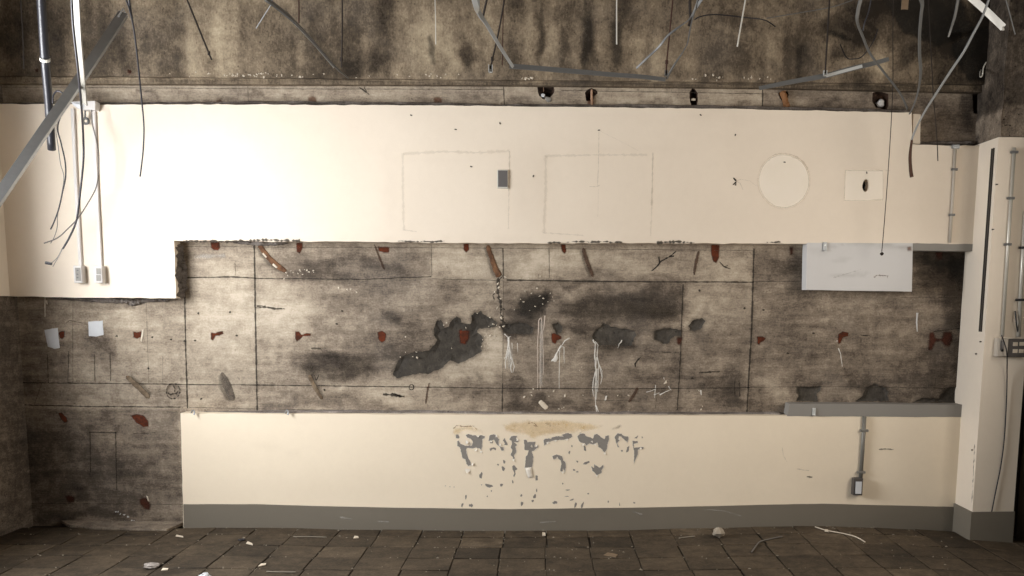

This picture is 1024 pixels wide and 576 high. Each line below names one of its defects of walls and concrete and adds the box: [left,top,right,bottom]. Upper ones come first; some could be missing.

water stain [504,334,518,373]
water stain [520,295,547,390]
corrosion [928,332,952,350]
water stain [592,339,602,412]
spalling [796,386,821,402]
spalling [856,383,889,402]
corrosion [131,414,148,427]
peeling [456,432,644,508]